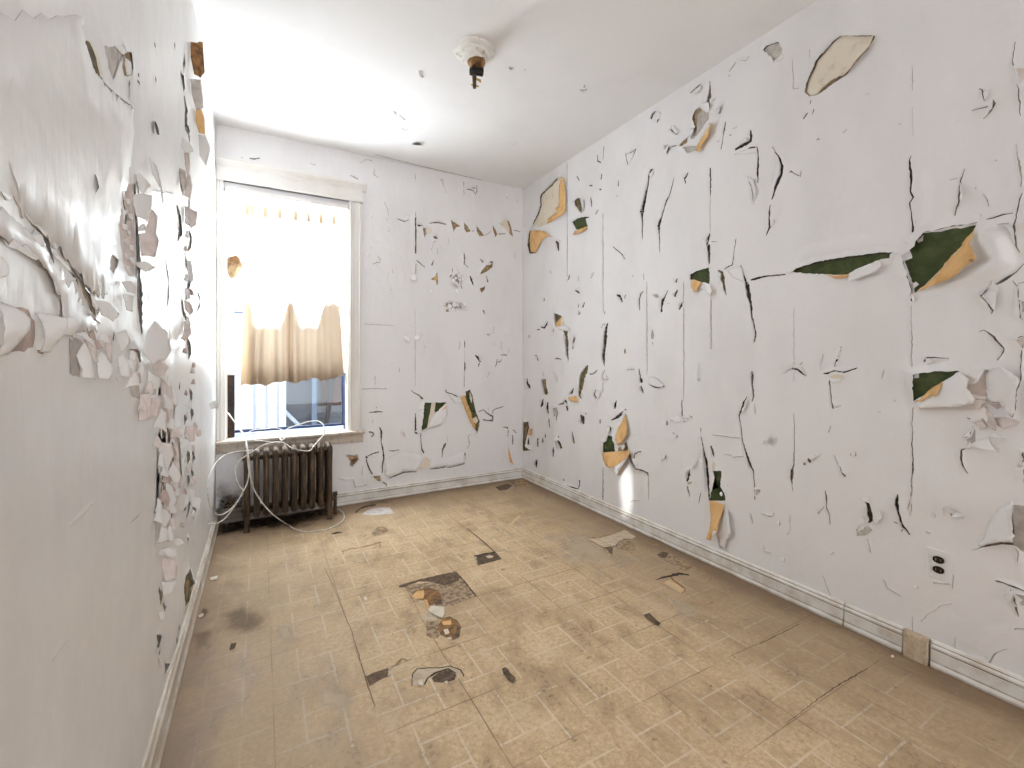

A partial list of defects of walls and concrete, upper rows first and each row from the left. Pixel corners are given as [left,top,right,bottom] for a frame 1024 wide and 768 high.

peeling [190,42,211,166]
peeling [648,83,722,158]
spalling [794,21,885,120]
peeling [528,146,606,254]
crack [397,86,1024,535]
peeling [793,252,891,281]
peeling [905,187,993,302]
peeling [0,156,201,678]
peeling [360,390,480,486]
peeling [602,414,630,475]
peeling [912,284,1024,474]
peeling [706,461,731,548]